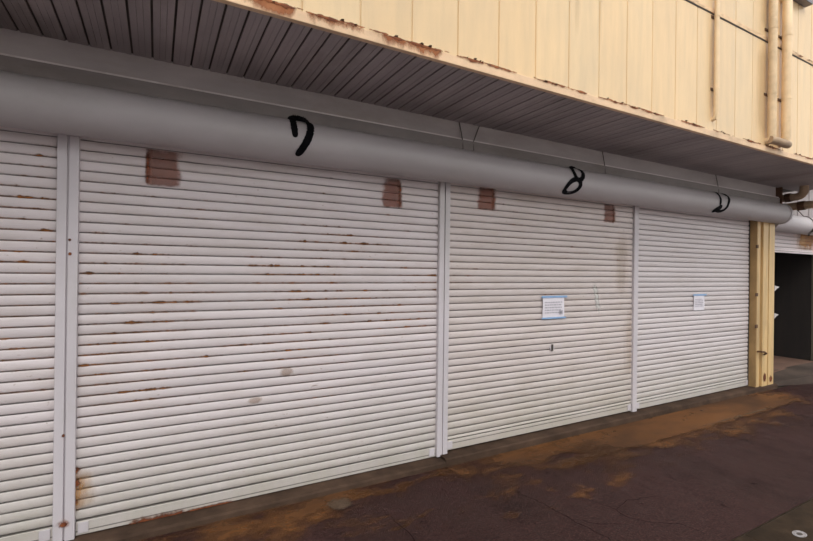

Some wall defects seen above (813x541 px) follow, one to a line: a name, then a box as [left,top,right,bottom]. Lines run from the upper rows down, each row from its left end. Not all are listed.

rust [253,0,517,73]
rust [146,149,180,186]
rust [0,185,57,242]
rust [383,178,402,215]
rust [478,187,495,210]
rust [604,204,615,222]
rust [78,244,219,402]
rust [223,226,429,383]
rust [75,467,83,506]
rust [129,501,231,525]